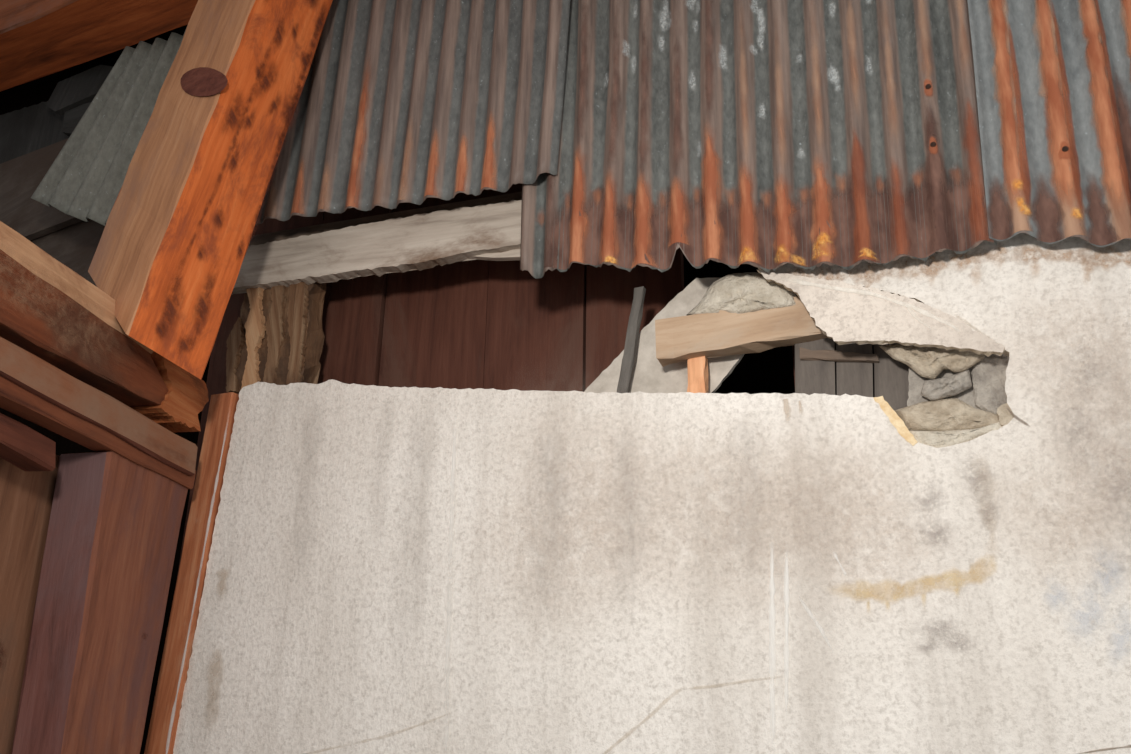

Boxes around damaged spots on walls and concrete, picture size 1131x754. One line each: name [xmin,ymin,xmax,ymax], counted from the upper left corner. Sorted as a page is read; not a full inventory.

rust [291,167,303,214]
rust [346,85,367,207]
rust [424,138,438,197]
rust [455,139,467,192]
rust [481,121,495,189]
rust [545,0,1131,280]
spalling [757,270,1014,448]